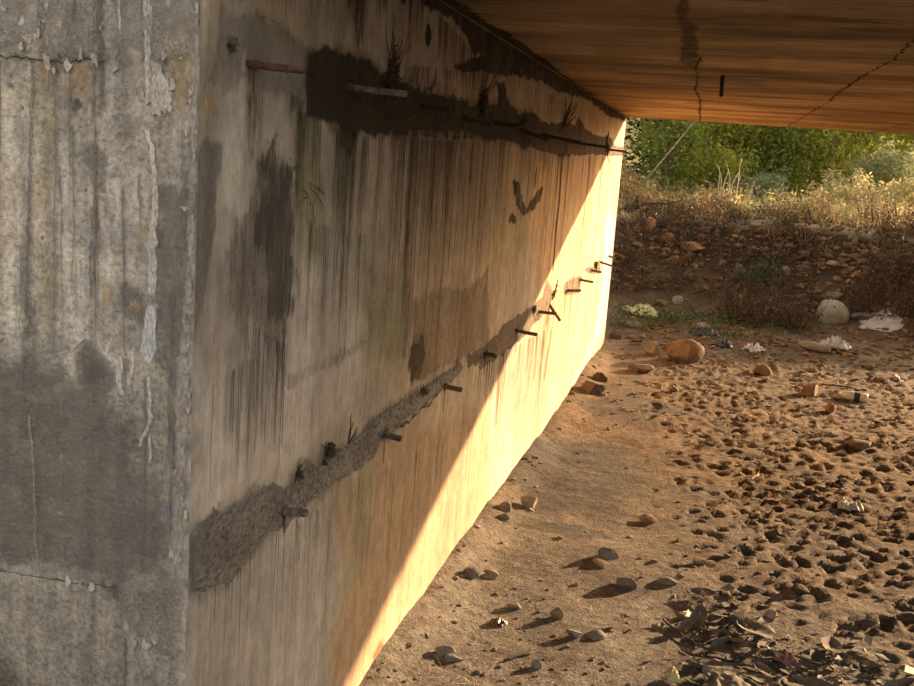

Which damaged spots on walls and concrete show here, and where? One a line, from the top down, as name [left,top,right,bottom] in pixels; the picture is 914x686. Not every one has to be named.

crack [0,50,121,74]
water stain [140,0,153,98]
crack [693,56,705,123]
crack [786,39,914,128]
water stain [225,0,627,470]
water stain [0,60,221,609]
crack [0,570,124,595]